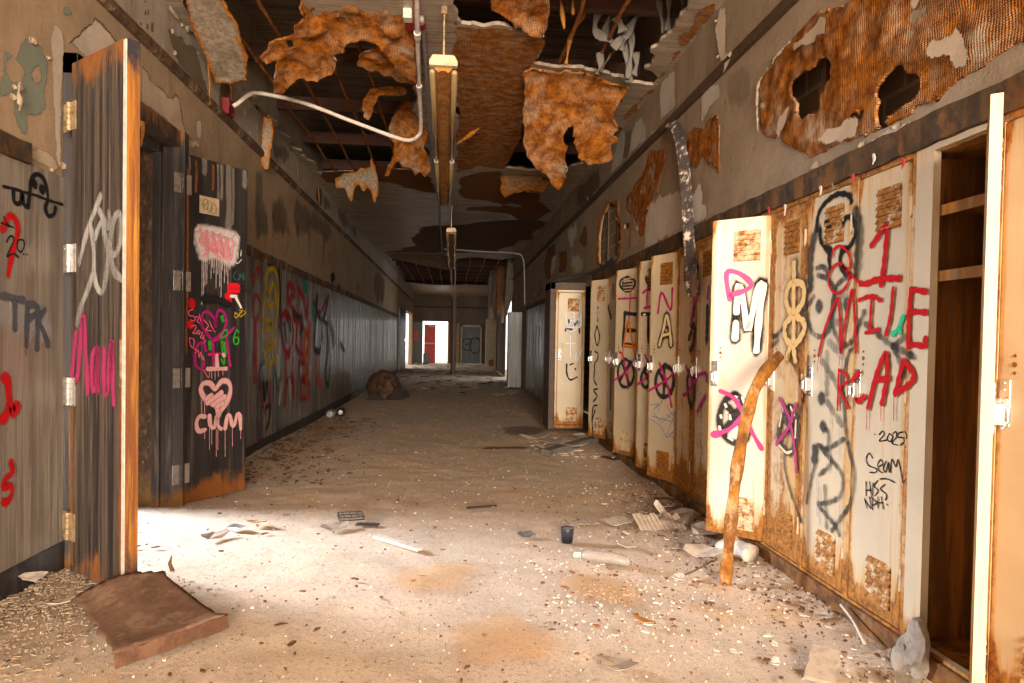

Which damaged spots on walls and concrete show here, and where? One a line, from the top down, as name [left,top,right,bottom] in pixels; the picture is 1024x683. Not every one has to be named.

peeling [0,21,115,172]
peeling [168,6,231,108]
peeling [611,71,675,173]
peeling [701,8,732,122]
flaking render [853,121,911,150]